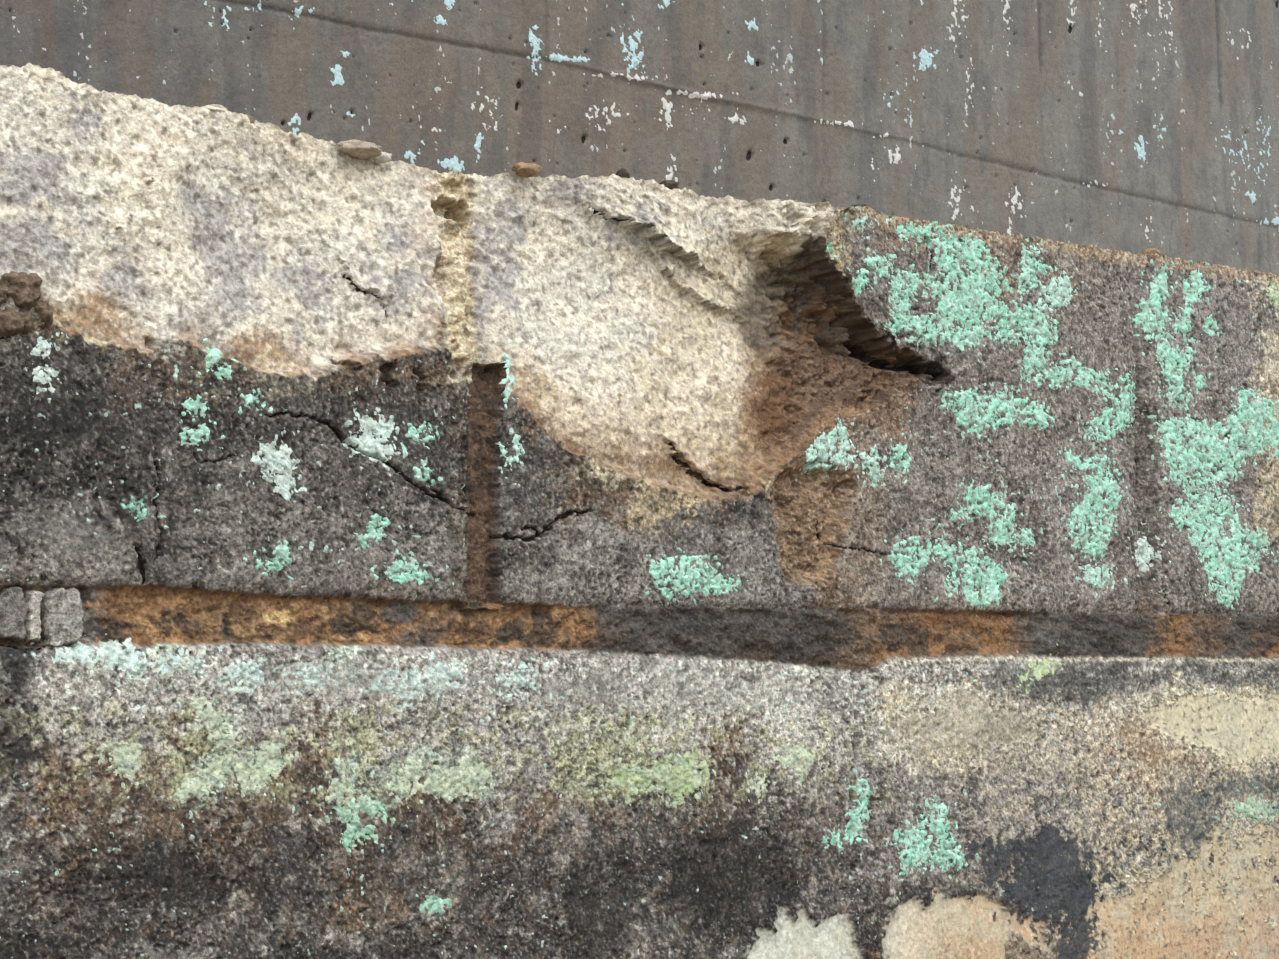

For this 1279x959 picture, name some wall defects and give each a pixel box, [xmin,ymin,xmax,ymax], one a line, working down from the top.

spalling [468,173,954,590]
crack [268,412,589,542]
water stain [562,855,643,941]
water stain [664,817,795,935]
water stain [949,811,1116,959]